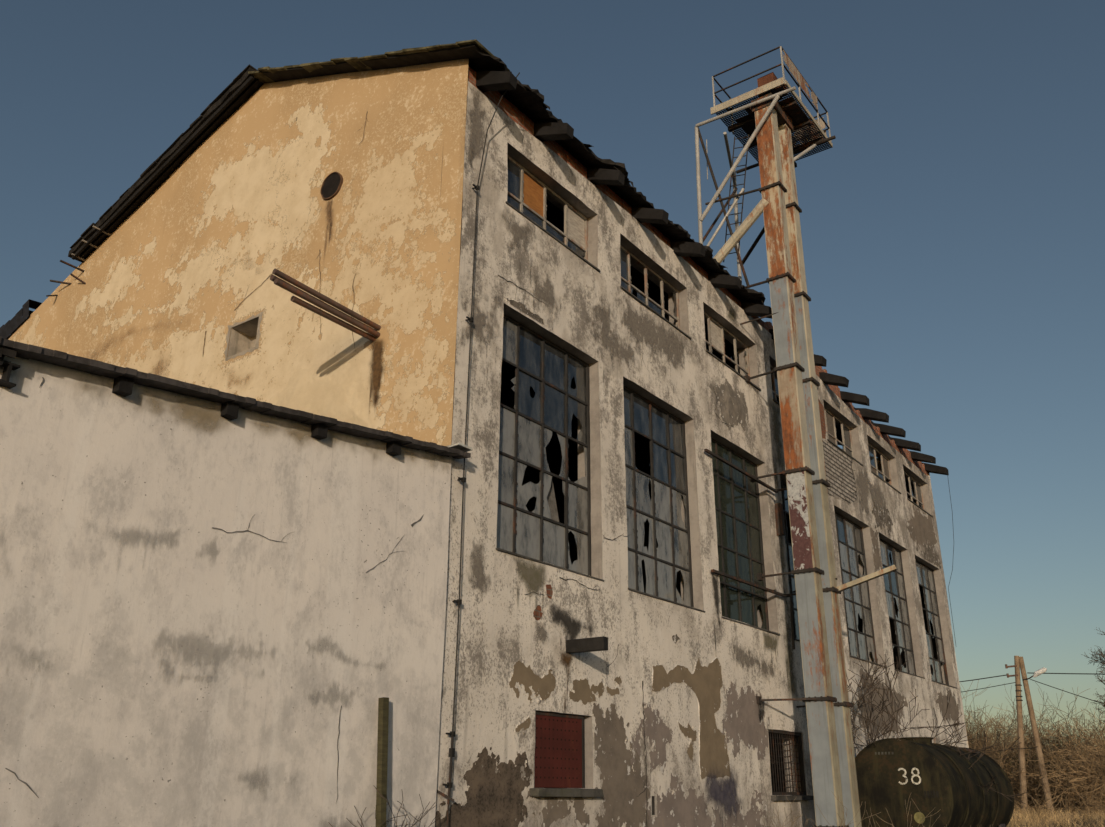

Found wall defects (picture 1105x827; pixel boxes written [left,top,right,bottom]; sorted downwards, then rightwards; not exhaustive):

water stain [468,89,488,167]
water stain [508,214,533,251]
peeling [74,102,456,445]
water stain [530,276,561,310]
peeling [13,313,48,347]
water stain [462,296,501,344]
water stain [593,300,684,375]
crack [212,518,292,543]
crack [366,514,424,573]
peeling [435,656,770,827]
crack [5,768,38,797]